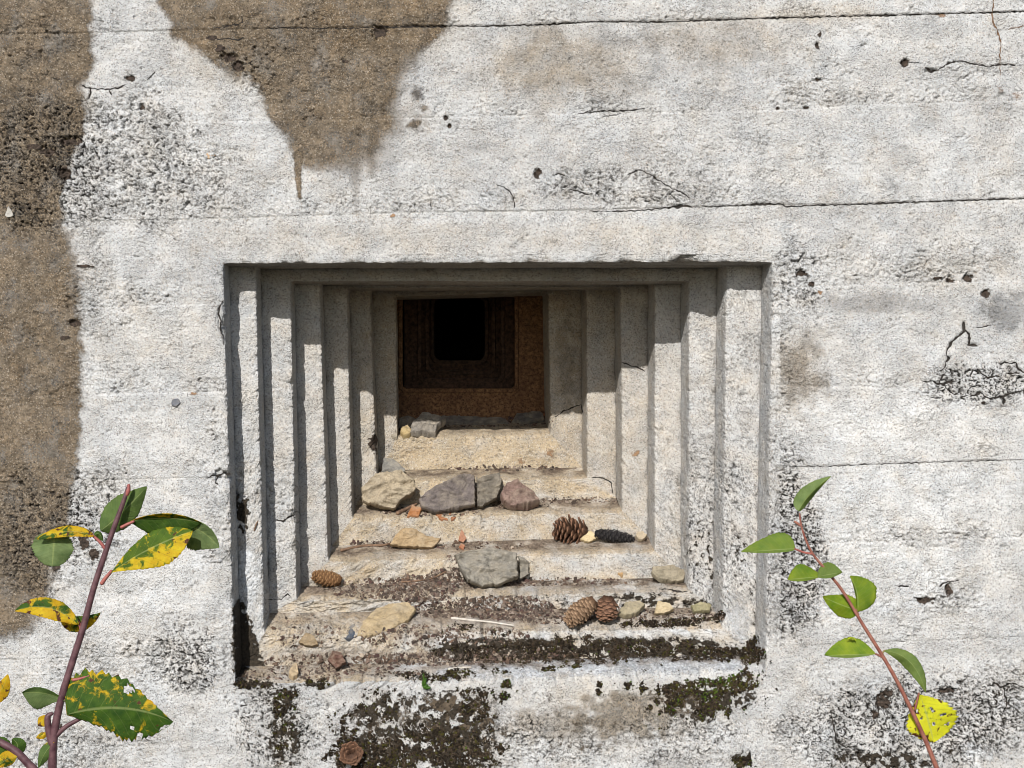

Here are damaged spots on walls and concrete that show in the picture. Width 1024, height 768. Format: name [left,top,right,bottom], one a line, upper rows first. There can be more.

crack [215,0,1024,75]
damp [157,0,452,199]
crack [554,170,1024,212]
damp [0,0,94,636]
crack [924,322,1024,405]
damp [601,504,714,608]
damp [323,531,765,768]